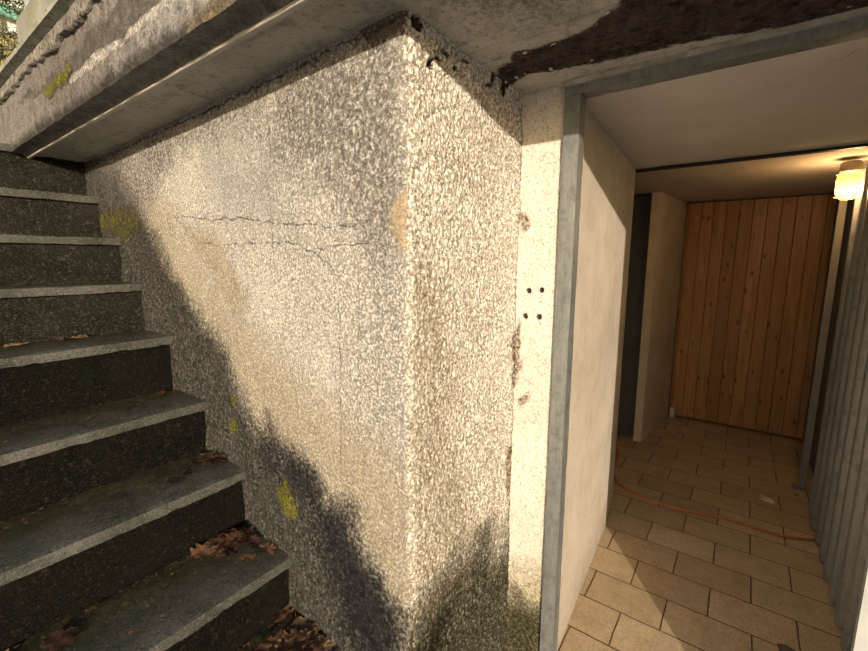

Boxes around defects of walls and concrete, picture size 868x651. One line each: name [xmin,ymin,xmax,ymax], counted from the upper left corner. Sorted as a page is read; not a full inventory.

damp [71,0,174,83]
crack [172,121,371,324]
damp [279,43,407,240]
spalling [426,48,470,71]
peeling [497,0,868,85]
damp [84,79,409,651]